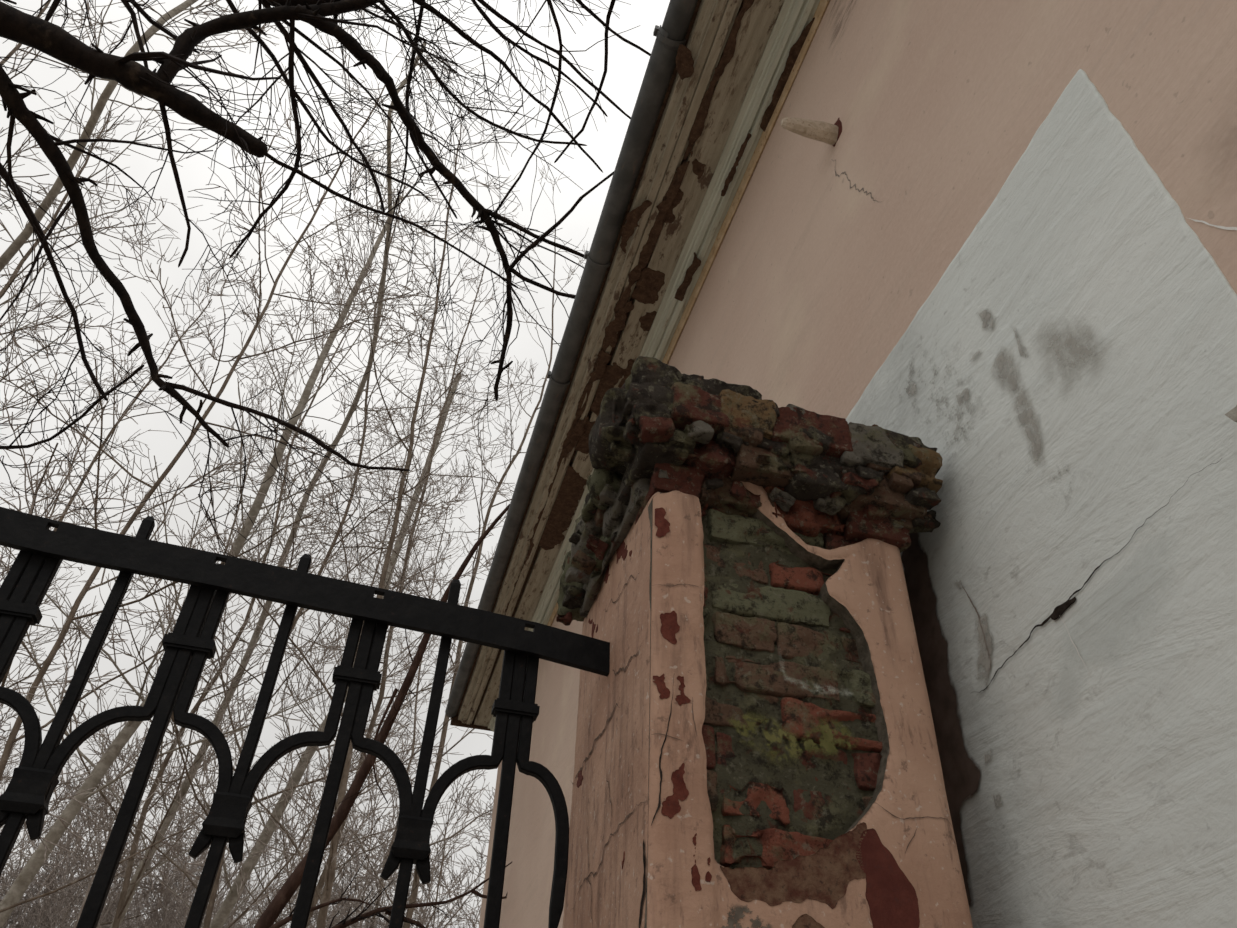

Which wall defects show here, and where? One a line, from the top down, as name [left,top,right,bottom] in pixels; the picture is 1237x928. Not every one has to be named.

spalling [721,18,815,196]
crack [834,160,878,202]
peeling [505,0,754,615]
leakage [979,310,993,328]
leakage [994,331,1041,460]
crack [604,573,698,612]
peeling [660,611,680,644]
crack [970,461,1219,694]
peeling [653,674,691,706]
crack [570,648,697,928]
peeling [661,763,689,819]
peeling [691,822,920,928]